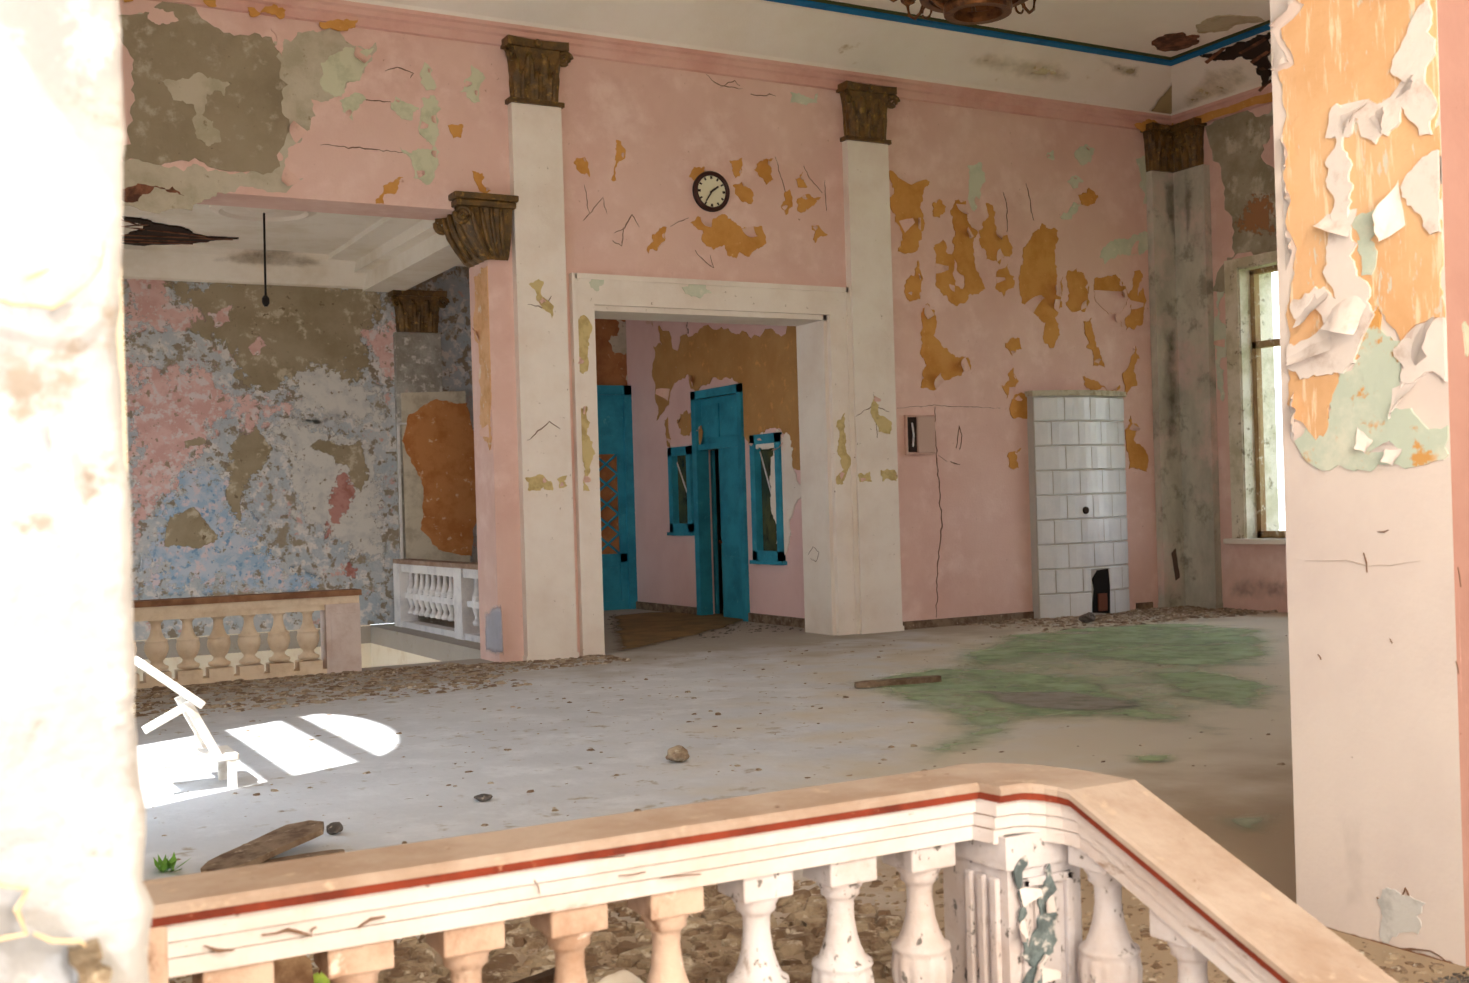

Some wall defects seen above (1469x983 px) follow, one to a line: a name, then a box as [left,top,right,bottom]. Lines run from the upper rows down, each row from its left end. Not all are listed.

flaking render [120,0,377,246]
flaking render [122,279,397,578]
peeling [525,406,595,491]
peeling [646,321,801,555]
peeling [691,214,766,259]
peeling [729,158,828,243]
crack [857,394,996,617]
peeling [1002,337,1028,419]
peeling [889,144,1148,395]
leakage [1171,549,1180,580]
peeling [1134,0,1469,471]
flaking render [67,937,113,983]